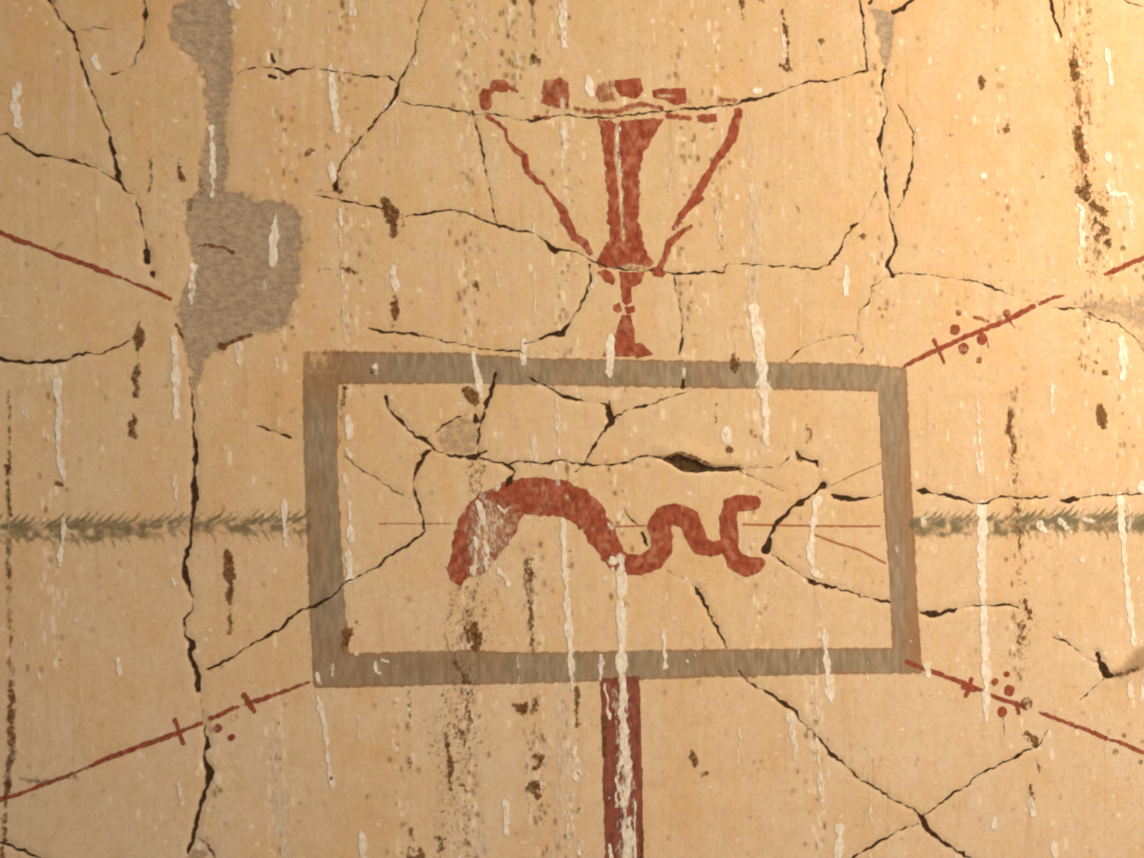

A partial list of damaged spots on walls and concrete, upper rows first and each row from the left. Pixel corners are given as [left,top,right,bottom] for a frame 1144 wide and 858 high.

crack [4,0,156,278]
spalling [169,0,303,385]
spalling [872,10,894,65]
corrosion [1069,46,1112,255]
crack [182,0,1004,692]
leakage [747,195,771,446]
corrosion [0,681,16,858]
crack [187,725,216,858]
corrosion [526,753,545,800]
leakage [598,554,628,706]
crack [695,586,1047,858]
leakage [976,500,992,723]